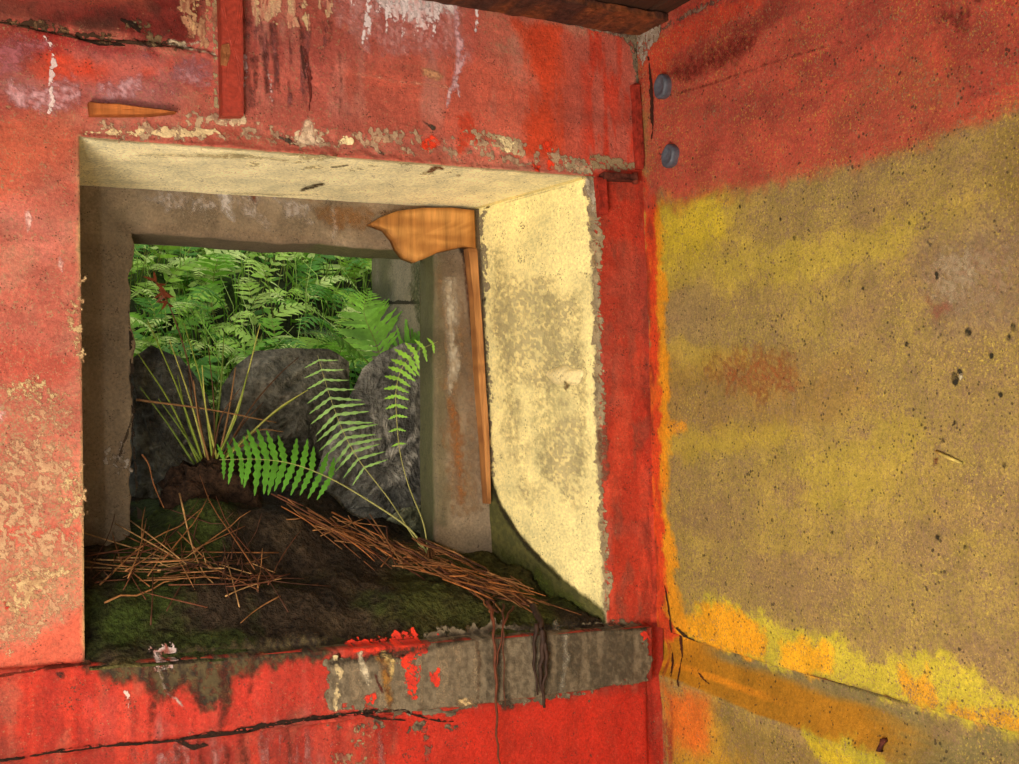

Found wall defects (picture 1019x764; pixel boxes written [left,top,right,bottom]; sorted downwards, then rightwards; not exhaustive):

crack [0,18,216,56]
water stain [245,20,279,105]
water stain [288,27,311,105]
water stain [334,0,468,105]
spalling [566,0,721,83]
peeling [66,276,87,382]
peeling [85,0,653,719]
peeling [0,374,88,658]
crack [0,660,91,678]
crack [0,709,458,762]
spalling [330,727,367,764]
spalling [421,728,432,761]